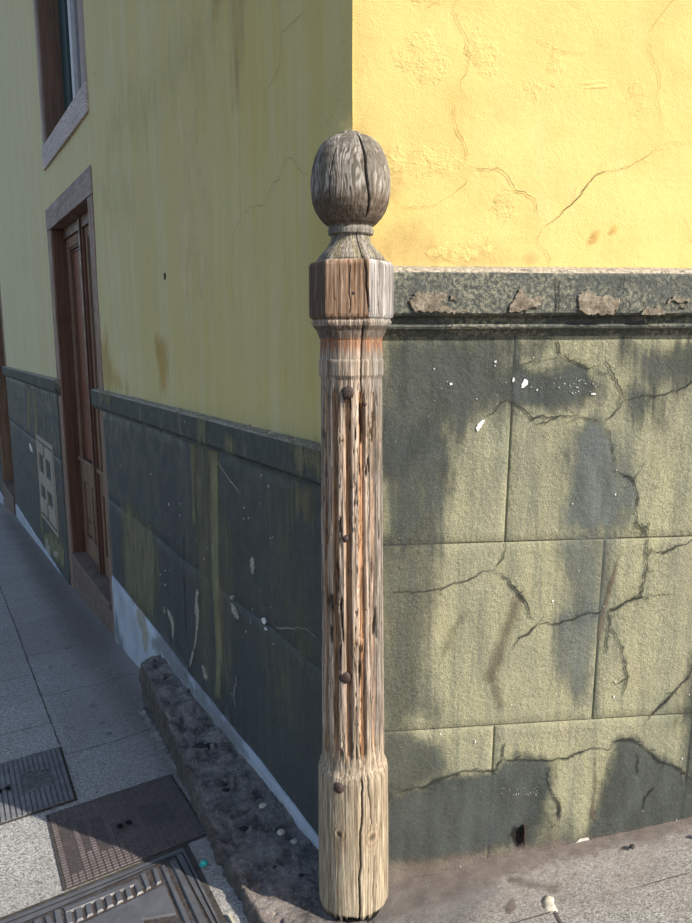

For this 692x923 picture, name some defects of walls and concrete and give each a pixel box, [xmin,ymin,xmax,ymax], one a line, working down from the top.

crack [406,0,675,310]
peeling [409,291,470,314]
peeling [508,288,543,313]
peeling [577,289,621,316]
peeling [641,296,690,316]
leakage [382,336,596,721]
crack [392,342,692,693]
leakage [559,420,636,694]
leakage [384,731,551,864]
crack [403,738,692,826]
leakage [590,685,692,839]
crack [649,672,691,719]